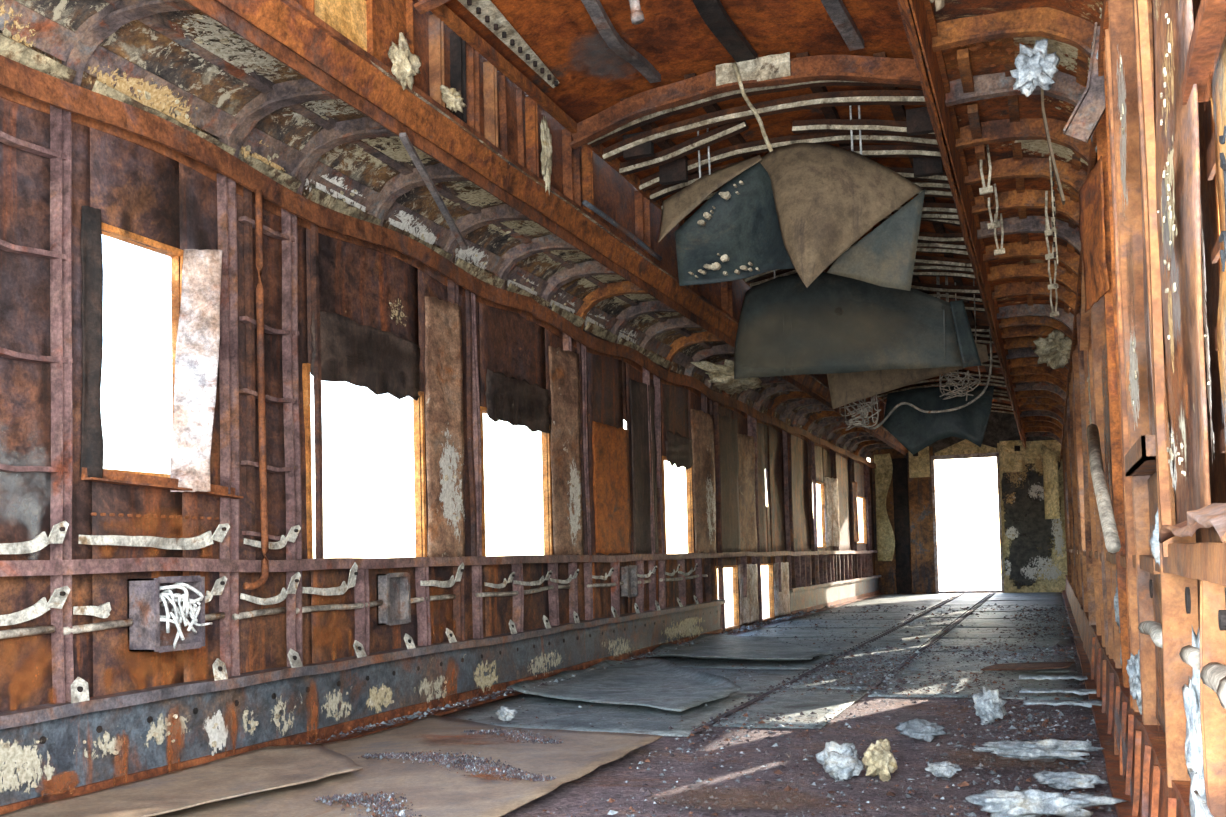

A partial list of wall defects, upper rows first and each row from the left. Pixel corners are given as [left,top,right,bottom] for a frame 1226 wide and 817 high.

peeling [1117,47,1128,217]
peeling [1154,0,1181,373]
peeling [1128,328,1140,430]
peeling [1167,408,1187,492]
rust [443,659,457,706]
peeling [0,735,55,793]
rust [42,771,79,797]
rust [114,736,128,787]
rust [167,712,183,772]
peeling [140,710,228,756]
peeling [243,697,296,736]
rust [307,684,318,743]